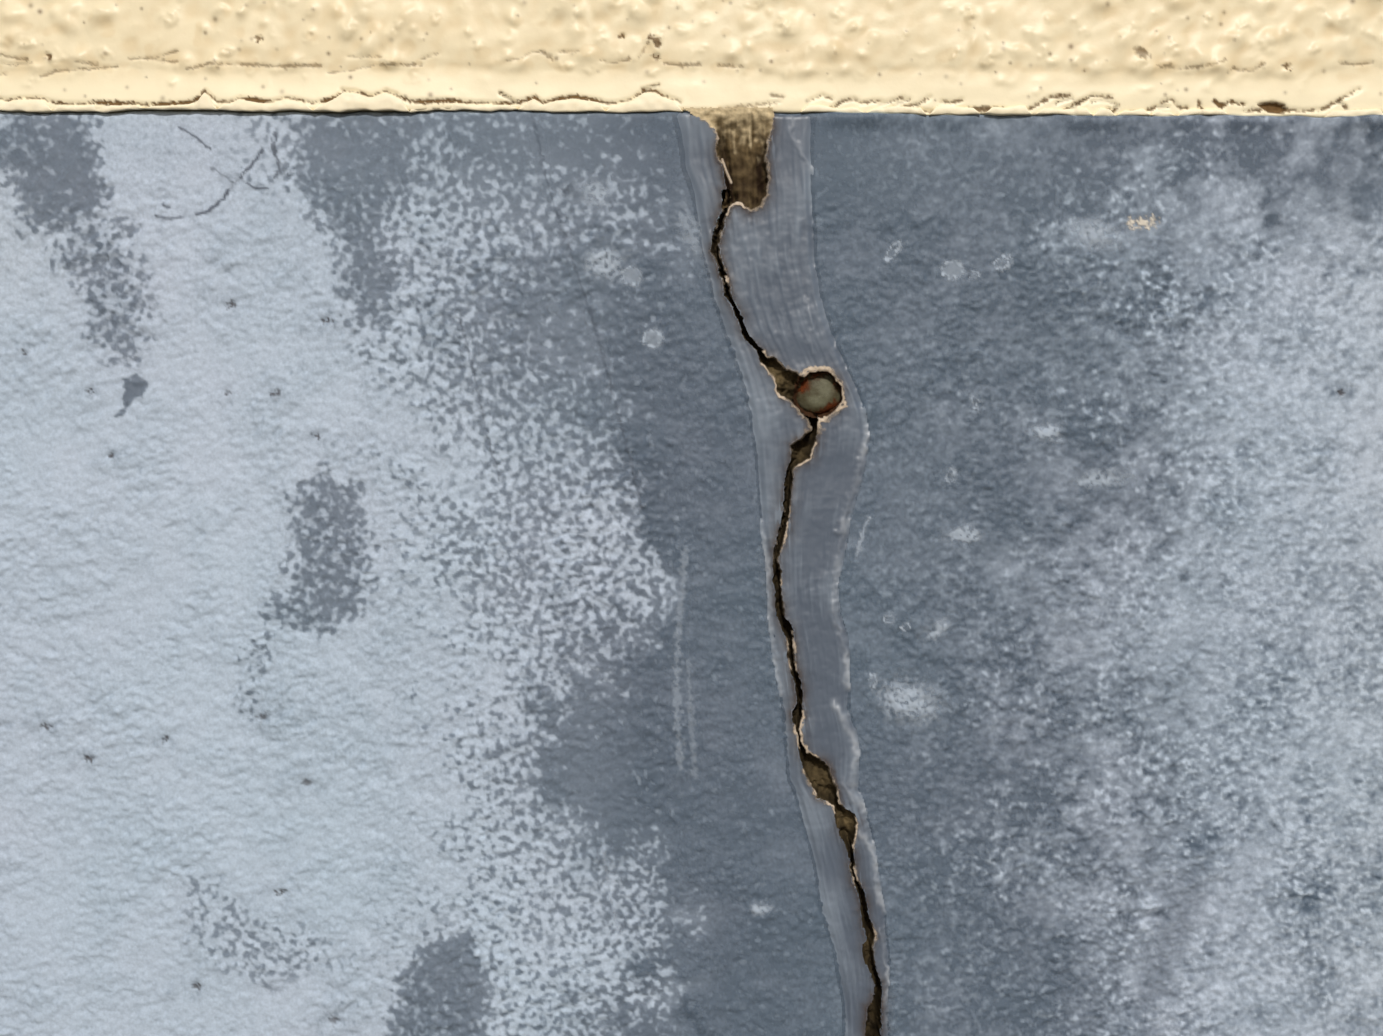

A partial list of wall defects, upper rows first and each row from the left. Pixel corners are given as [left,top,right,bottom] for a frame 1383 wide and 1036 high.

leakage [0,115,104,247]
spalling [683,107,774,215]
leakage [88,264,136,342]
leakage [120,378,144,414]
leakage [265,483,364,631]
leakage [300,110,846,1036]
crack [710,166,882,1036]
leakage [772,112,1383,1036]